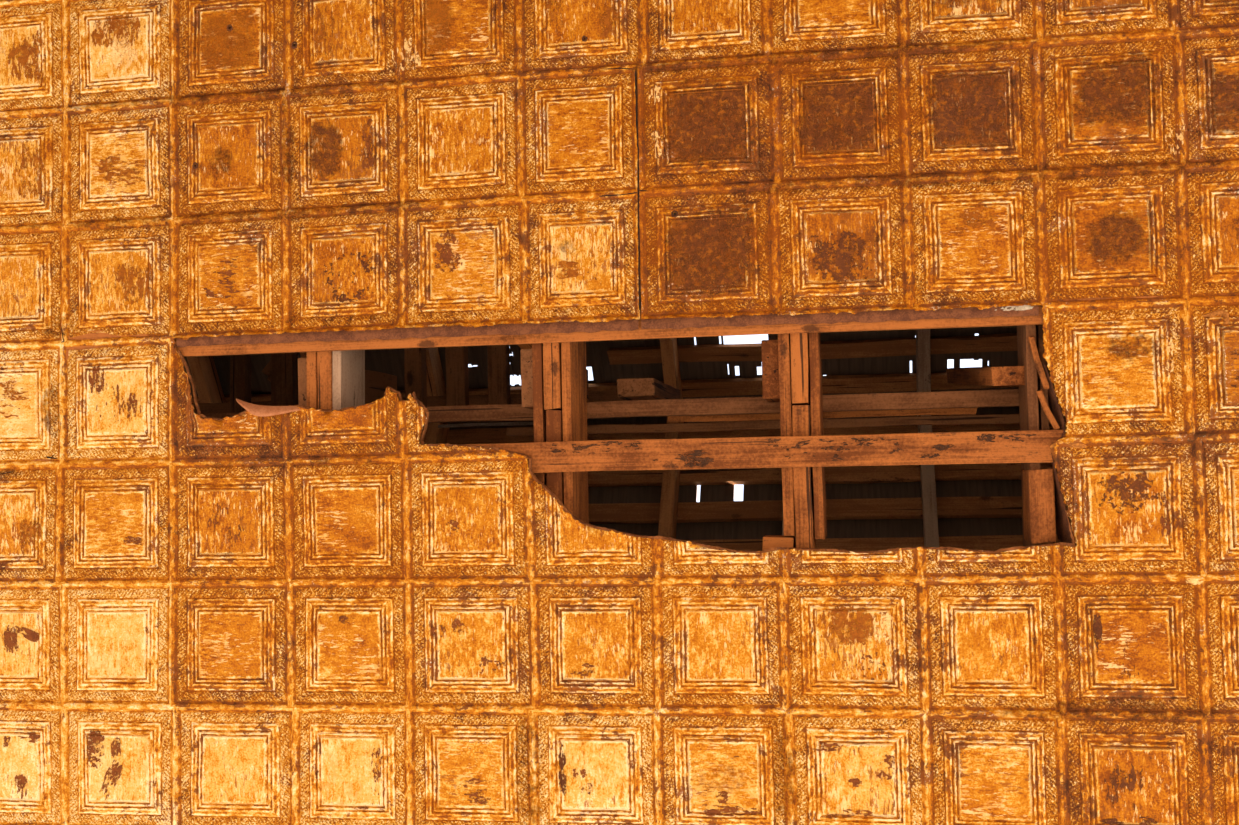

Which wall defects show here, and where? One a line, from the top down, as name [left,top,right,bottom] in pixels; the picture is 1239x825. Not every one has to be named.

corrosion [636,62,755,168]
corrosion [747,49,887,161]
corrosion [1075,53,1161,125]
corrosion [282,123,343,181]
corrosion [853,171,958,188]
corrosion [660,204,757,298]
corrosion [1087,210,1148,265]
peeling [785,444,850,461]
peeling [915,443,961,459]
peeling [977,434,1036,444]
peeling [207,503,244,544]